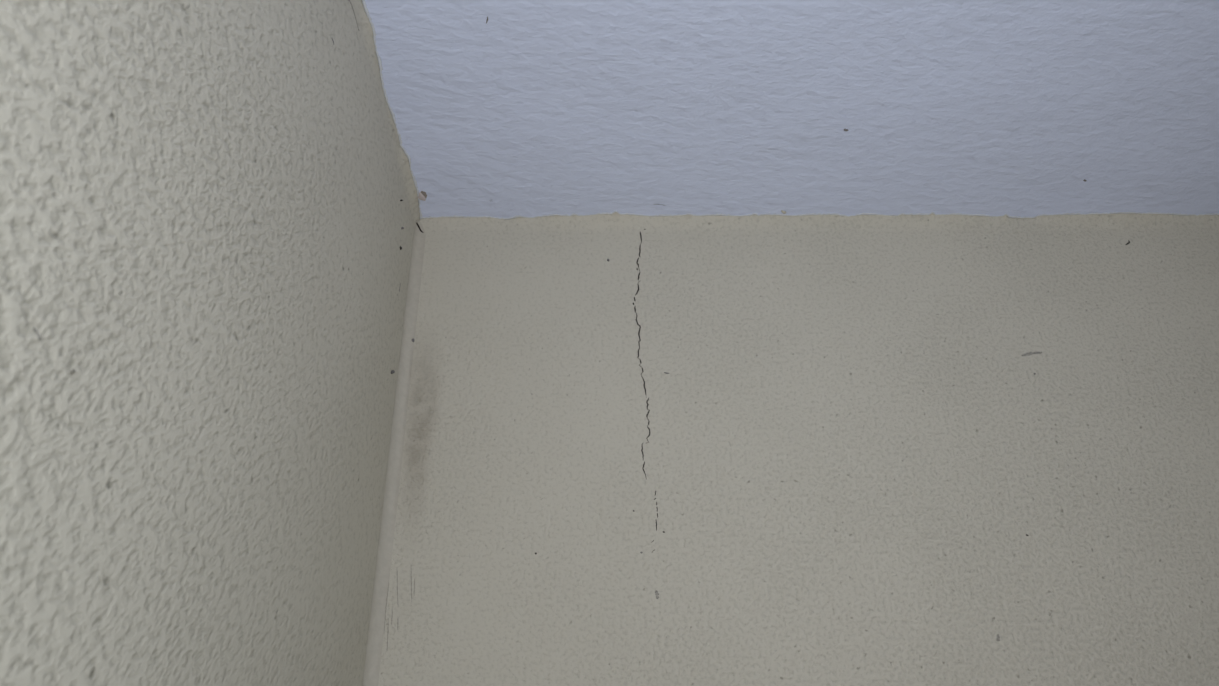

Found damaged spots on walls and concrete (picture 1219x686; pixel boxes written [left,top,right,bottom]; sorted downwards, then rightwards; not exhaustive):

crack [633,232,658,552]